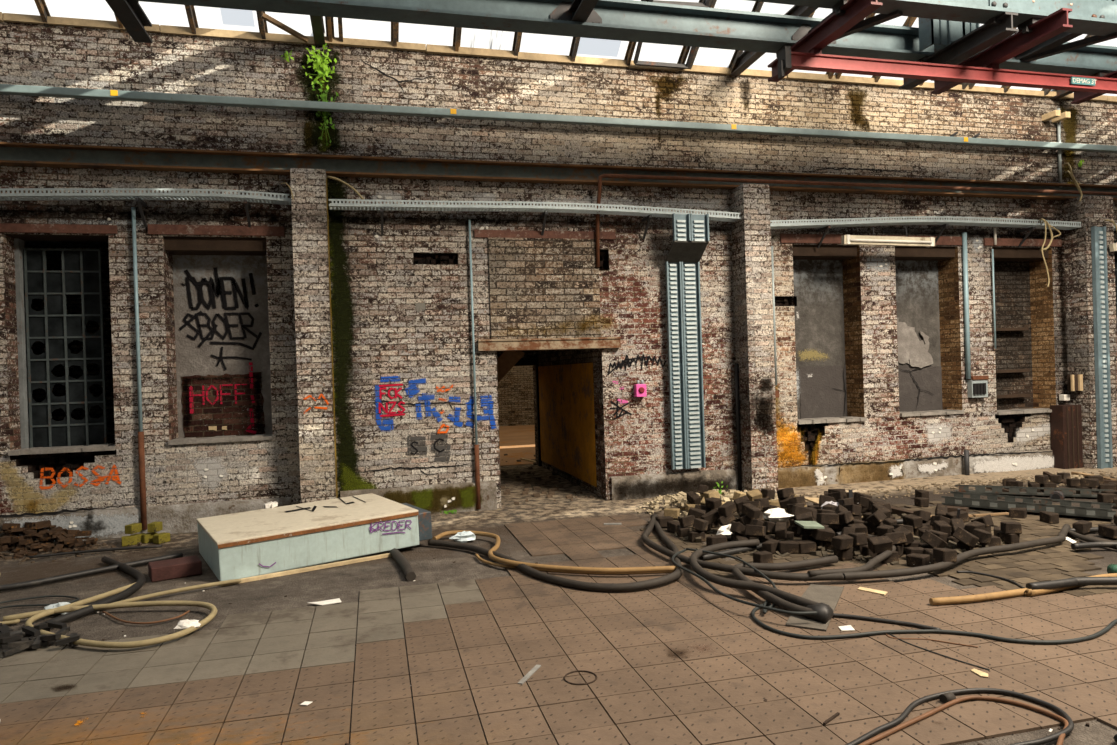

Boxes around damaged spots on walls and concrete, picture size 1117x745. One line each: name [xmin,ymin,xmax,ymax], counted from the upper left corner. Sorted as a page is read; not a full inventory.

damp [847,90,869,128]
peeling [897,318,933,368]
crack [898,368,934,411]
spalling [971,413,1054,474]
spalling [0,448,139,543]